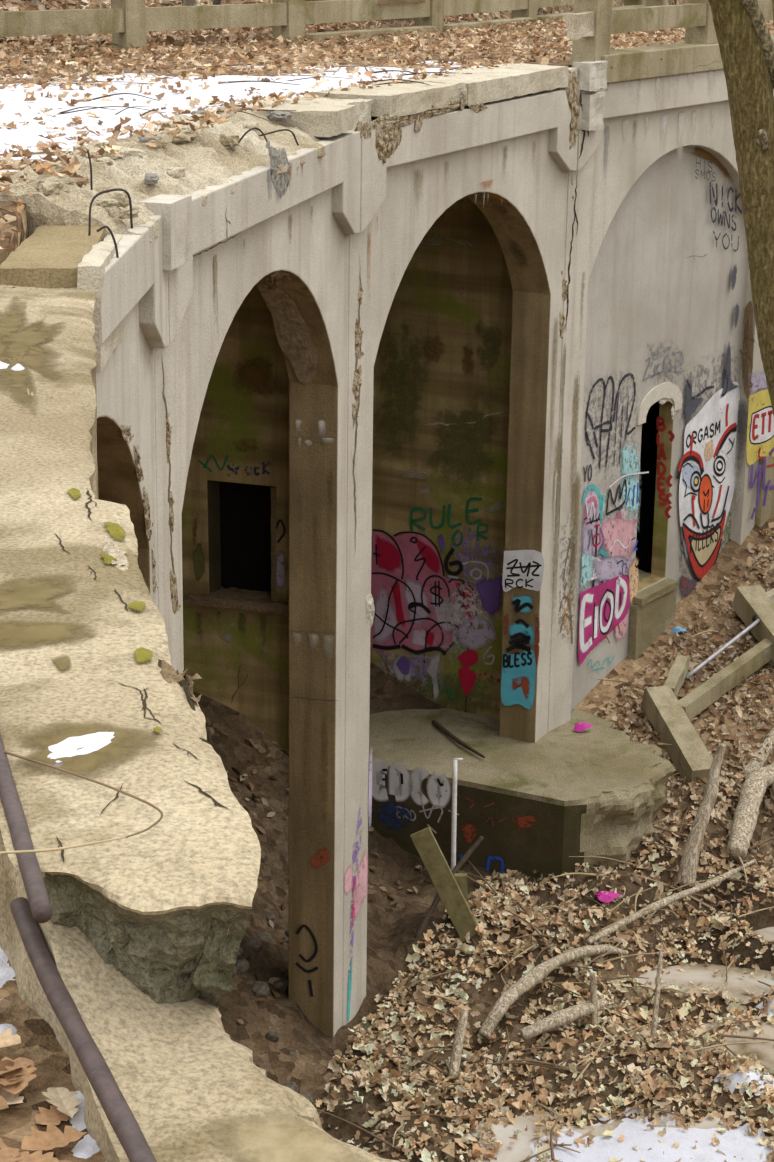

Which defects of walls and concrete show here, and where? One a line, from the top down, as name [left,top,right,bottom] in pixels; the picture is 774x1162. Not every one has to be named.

spalling [354,93,488,164]
spalling [565,70,581,149]
spalling [0,103,326,258]
crack [566,90,589,325]
damp [404,405,495,494]
spalling [103,536,129,571]
spalling [120,425,181,614]
damp [396,677,488,713]